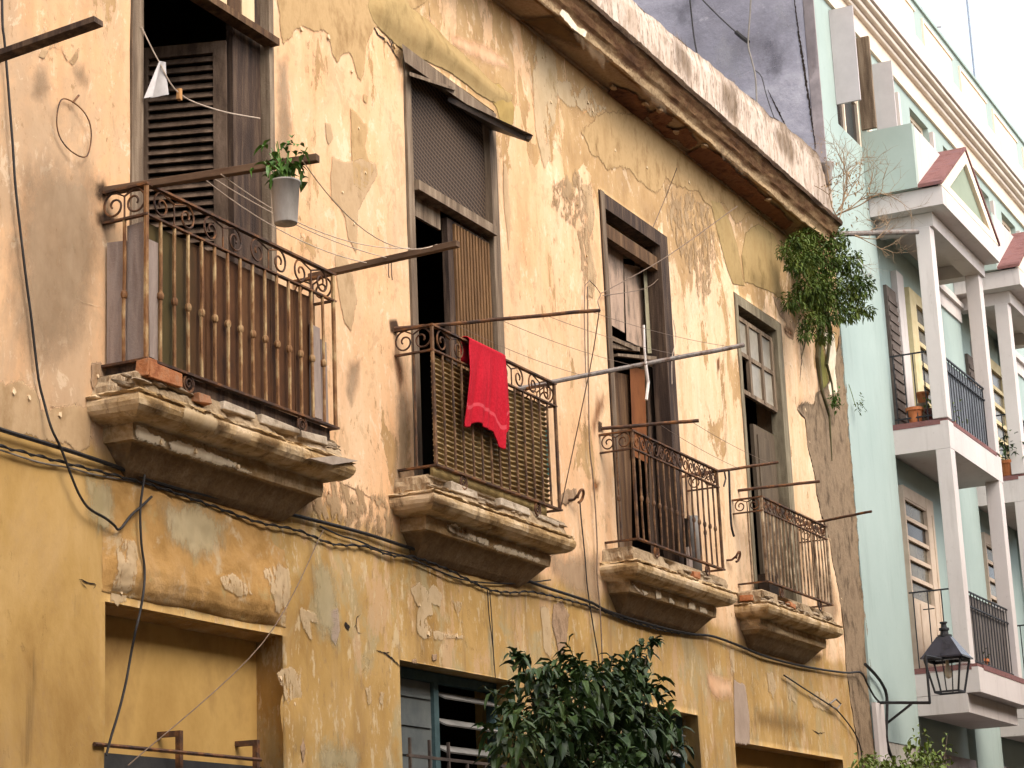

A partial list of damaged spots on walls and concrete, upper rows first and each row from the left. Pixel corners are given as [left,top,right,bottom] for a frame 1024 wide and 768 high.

flaking render [278,0,515,125]
peeling [331,108,377,331]
flaking render [313,481,393,539]
peeling [111,538,138,606]
peeling [221,573,253,596]
peeling [264,564,340,645]
peeling [411,582,463,640]
flaking render [277,666,302,706]